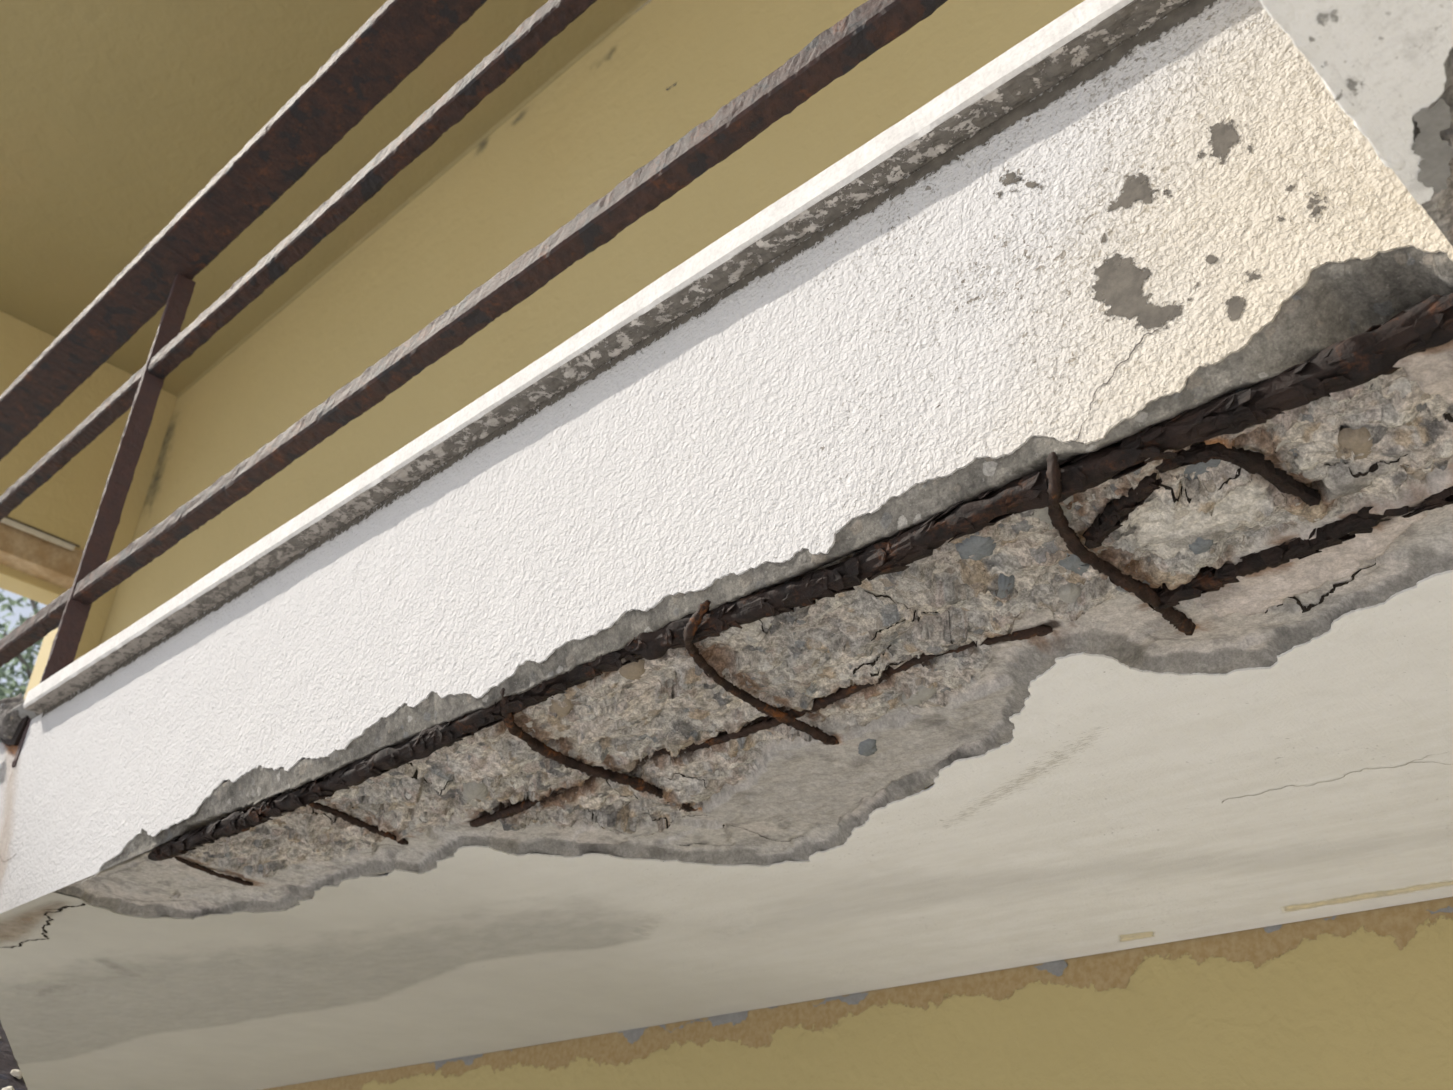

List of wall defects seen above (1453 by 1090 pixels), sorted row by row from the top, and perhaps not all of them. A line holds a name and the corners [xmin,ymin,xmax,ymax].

peeling [1309,10,1338,42]
spalling [53,47,1453,919]
crack [0,903,86,948]
peeling [261,897,1453,1090]